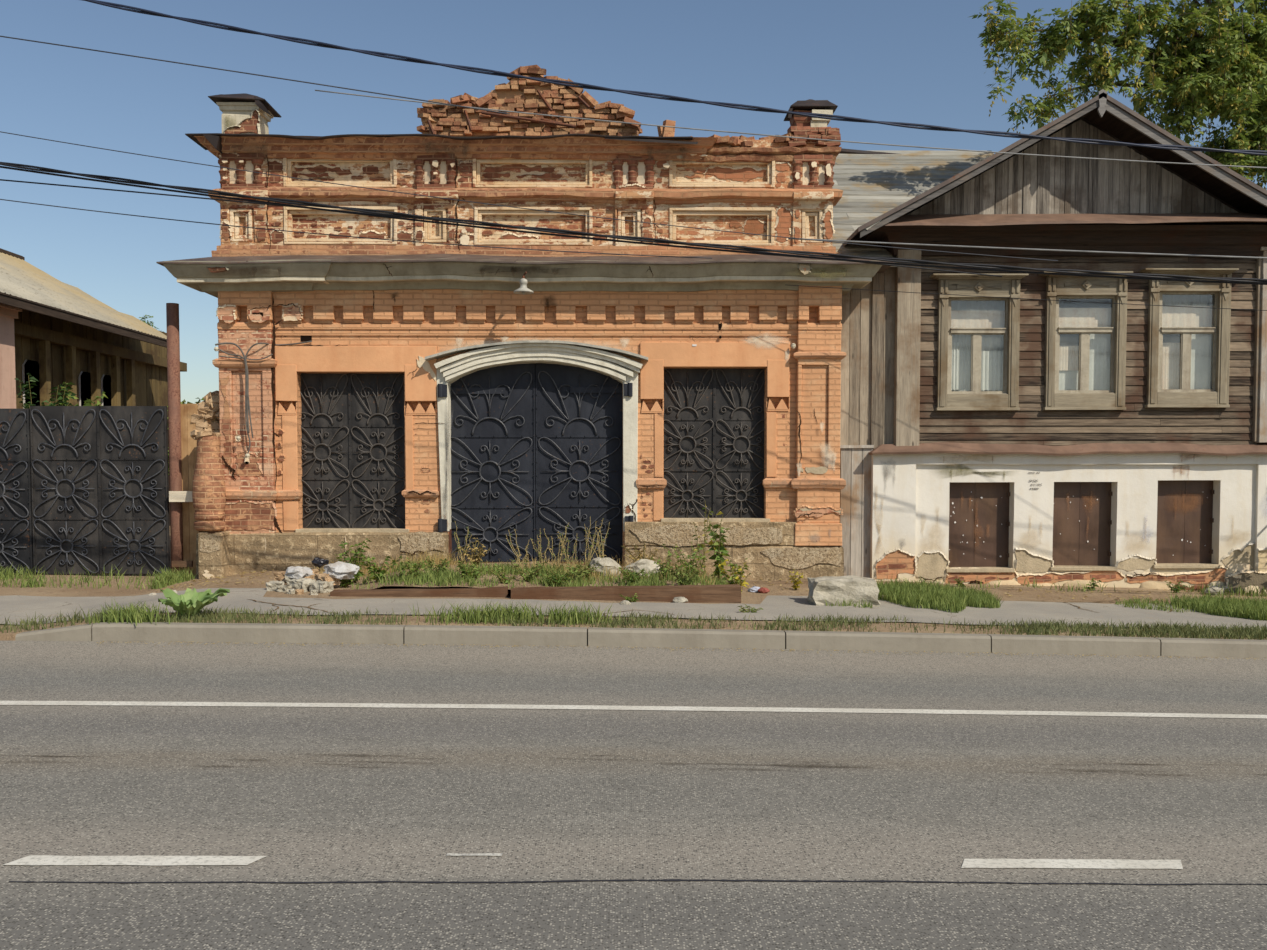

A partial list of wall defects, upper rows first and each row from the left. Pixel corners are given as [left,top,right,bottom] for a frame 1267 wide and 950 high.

peeling [450,154,800,190]
peeling [449,215,619,245]
peeling [641,203,800,244]
peeling [821,209,835,240]
flaking render [873,542,1267,593]